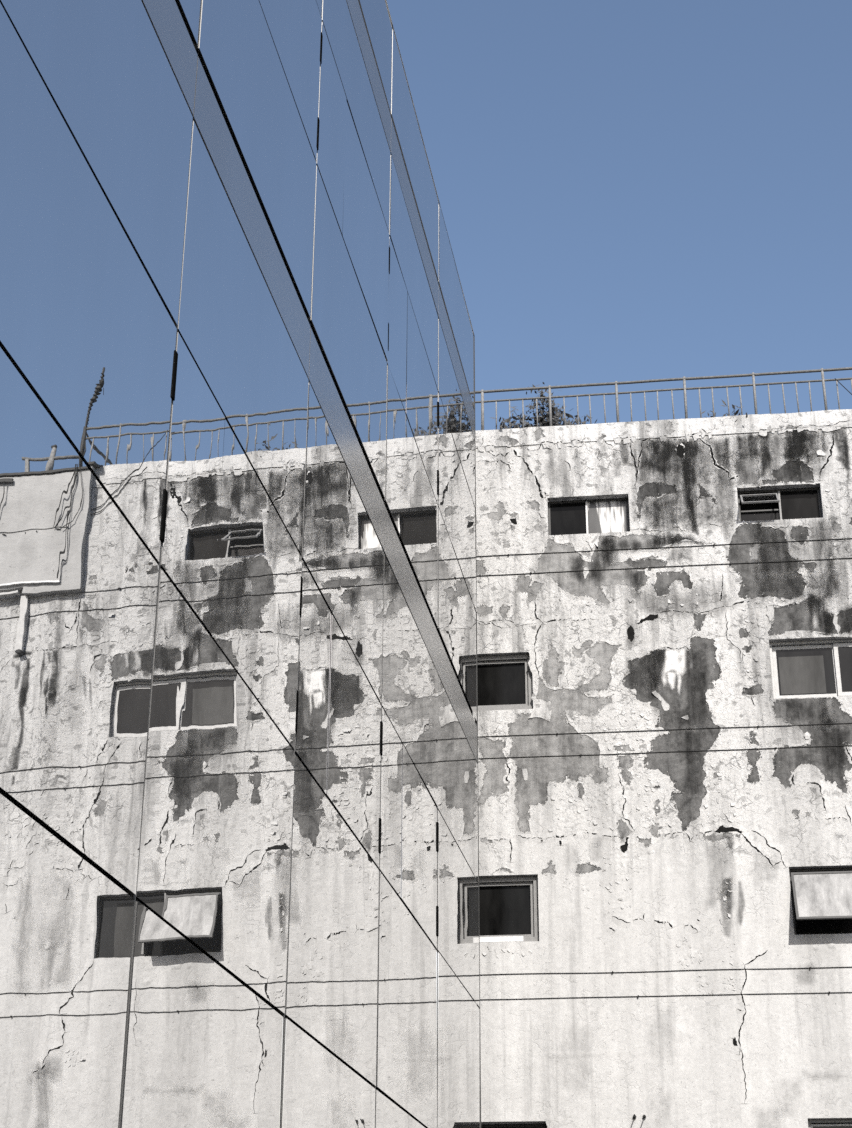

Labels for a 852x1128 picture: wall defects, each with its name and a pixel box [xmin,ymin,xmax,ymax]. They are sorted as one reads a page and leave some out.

water stain [640,428,813,546]
water stain [832,428,849,469]
water stain [575,540,639,579]
peeling [476,482,746,853]
water stain [660,649,704,722]
crack [732,946,771,1104]